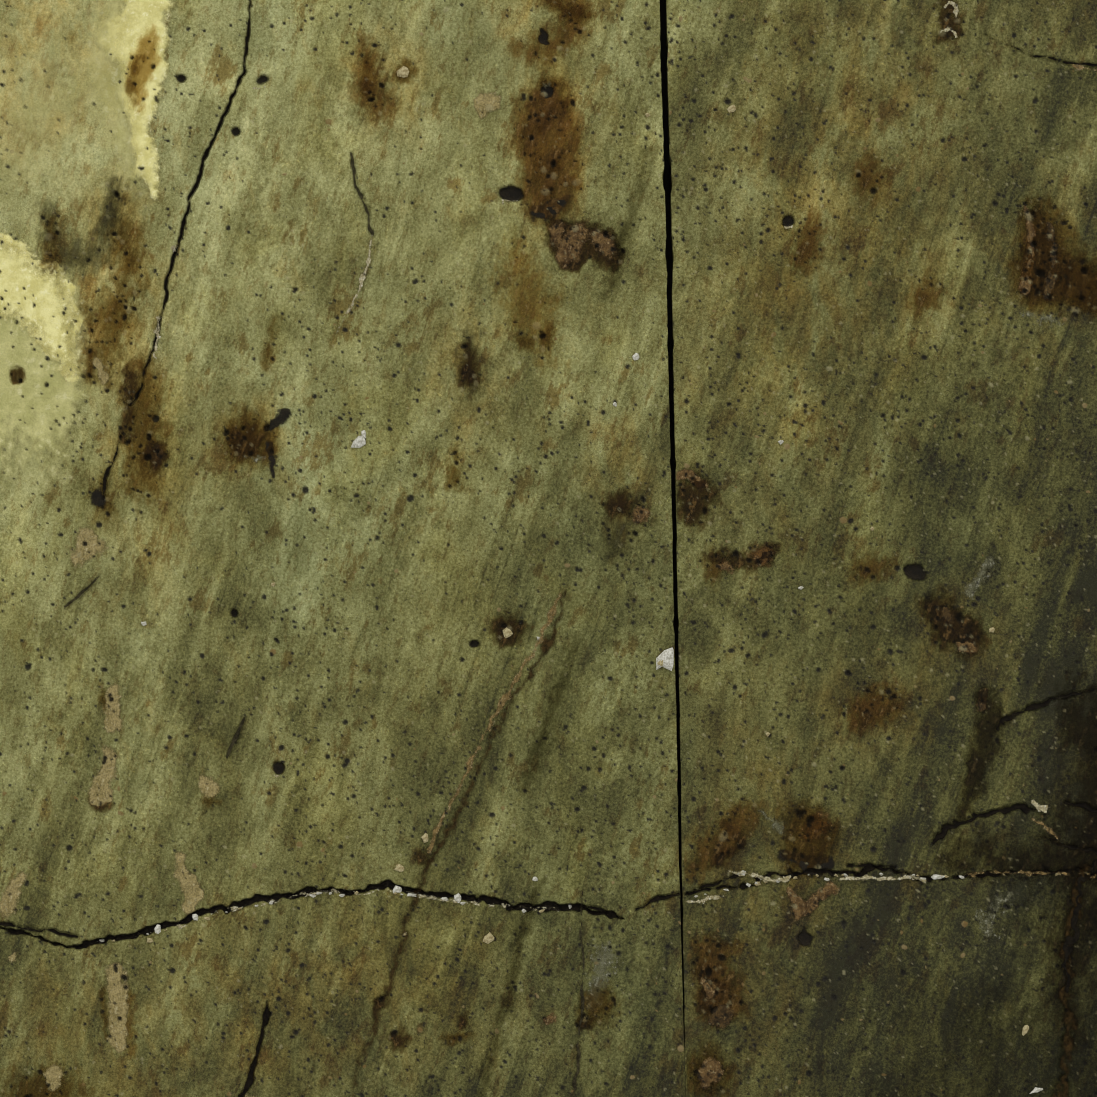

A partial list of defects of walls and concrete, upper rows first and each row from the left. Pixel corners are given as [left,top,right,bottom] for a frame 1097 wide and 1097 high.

crack [985,34,1097,71]
crack [130,1,251,406]
corrosion [530,195,569,221]
crack [103,435,121,499]
crack [0,591,1097,1097]